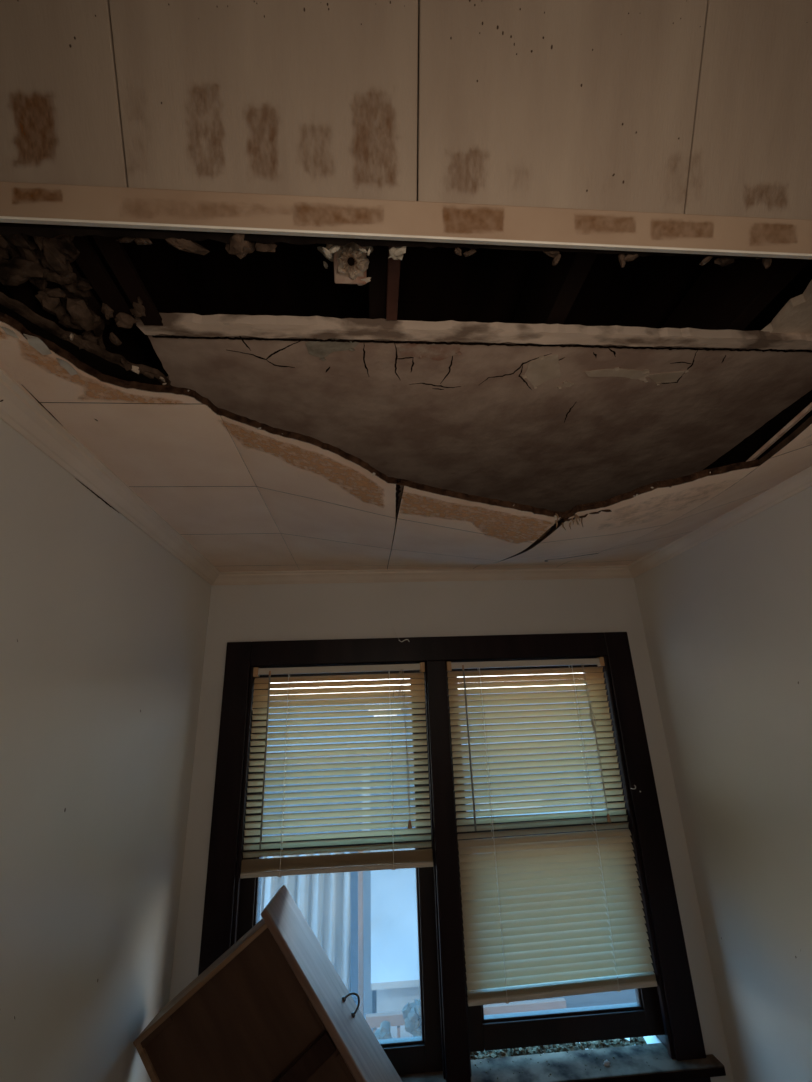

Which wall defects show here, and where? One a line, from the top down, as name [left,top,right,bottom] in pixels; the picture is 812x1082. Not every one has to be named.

spalling [0,222,812,390]
crack [228,336,300,368]
crack [394,343,565,390]
crack [394,479,402,513]
crack [513,520,598,562]